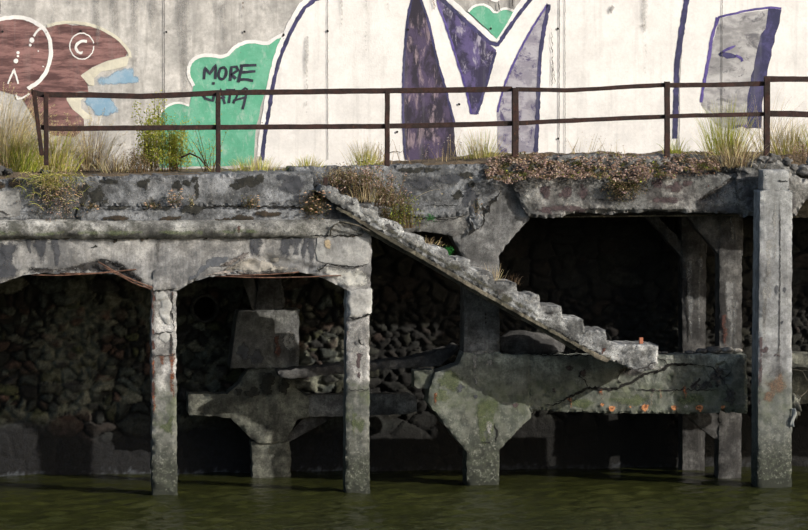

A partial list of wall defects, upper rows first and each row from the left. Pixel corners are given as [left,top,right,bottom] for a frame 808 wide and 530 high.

crack [417,190,533,235]
damp [0,231,19,279]
damp [26,232,64,265]
spalling [24,259,141,281]
damp [189,257,228,280]
damp [223,230,263,257]
damp [280,238,315,261]
crack [317,263,367,273]
rust [151,290,175,412]
crack [536,354,732,406]